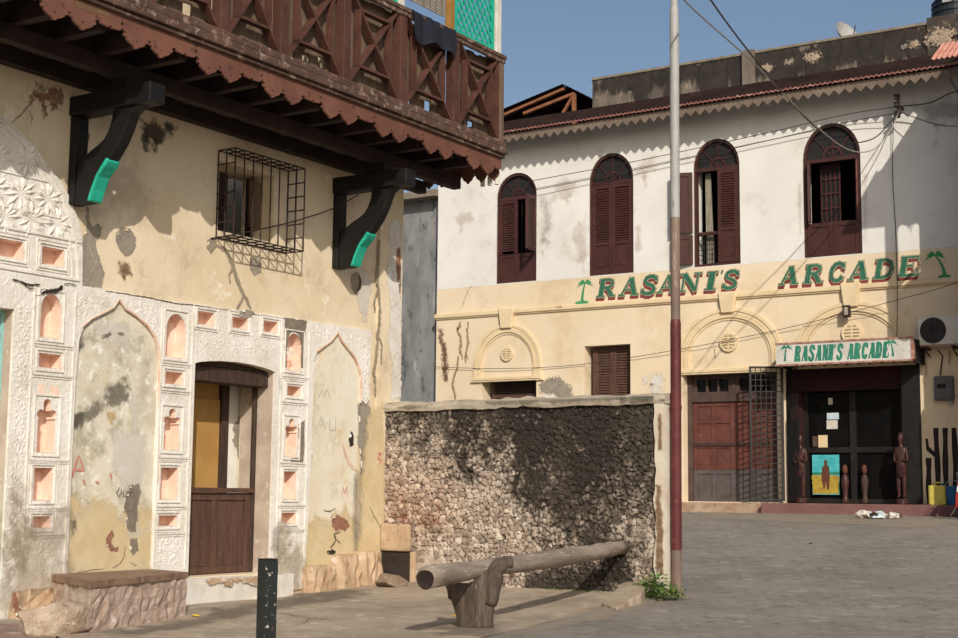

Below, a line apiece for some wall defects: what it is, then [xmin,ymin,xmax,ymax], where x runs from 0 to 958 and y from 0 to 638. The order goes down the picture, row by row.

peeling [901,22,958,51]
peeling [762,51,822,72]
spalling [30,83,64,116]
peeling [82,208,105,288]
peeling [116,227,136,256]
crack [106,241,257,315]
peeling [387,218,402,400]
crack [451,286,472,400]
peeling [538,376,573,398]
peeling [106,484,142,555]
peeling [331,515,350,532]